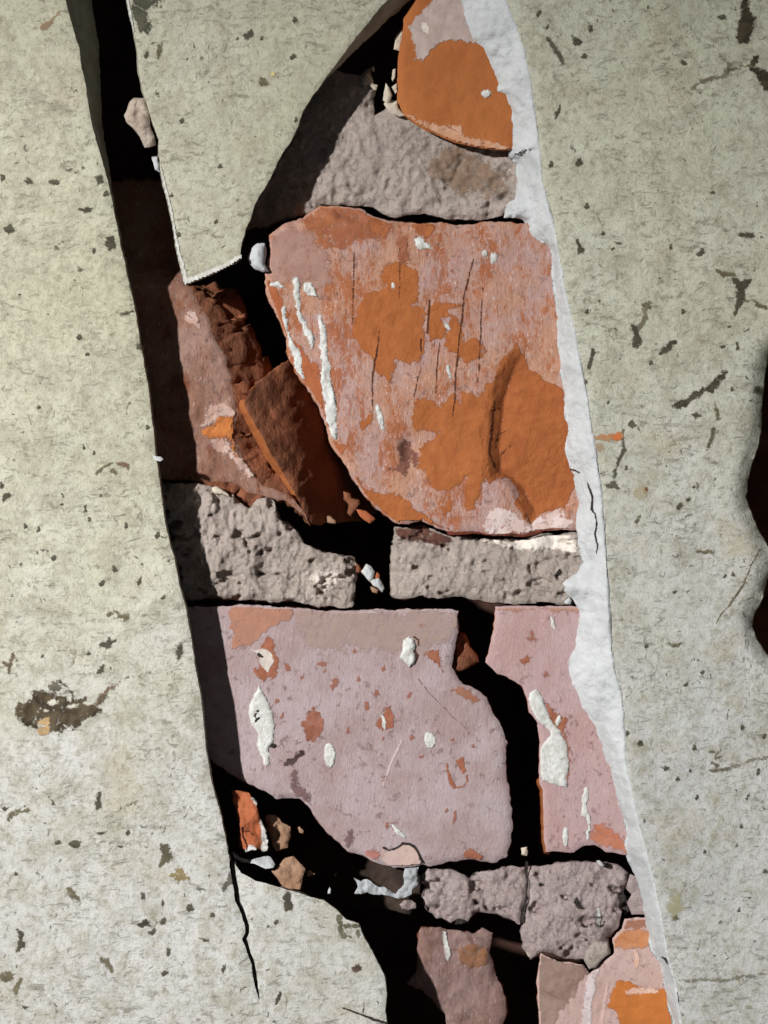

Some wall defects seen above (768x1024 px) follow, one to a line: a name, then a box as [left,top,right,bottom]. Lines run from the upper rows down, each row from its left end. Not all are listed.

spalling [160,166,242,285]
peeling [267,280,328,425]
peeling [302,208,487,383]
peeling [201,416,239,458]
flaking render [343,0,682,1024]
peeling [228,607,303,682]
spalling [301,707,324,742]
crack [222,860,260,999]